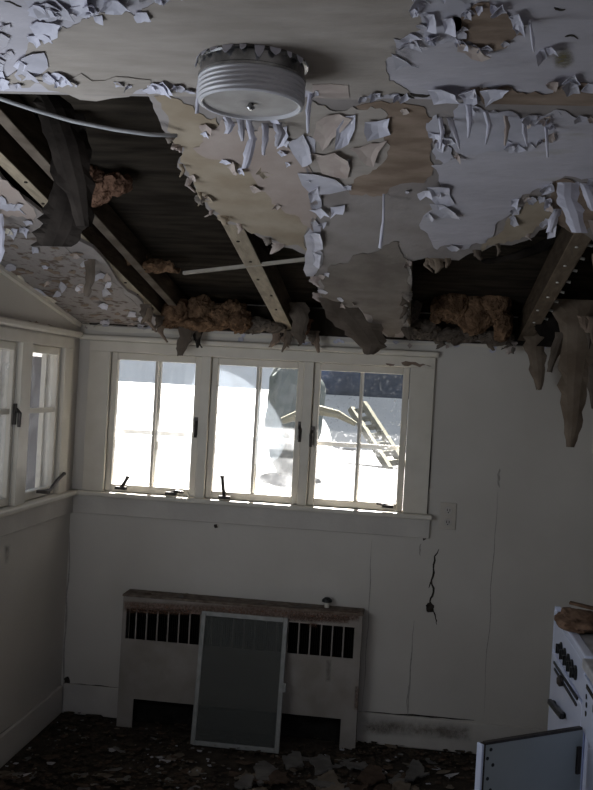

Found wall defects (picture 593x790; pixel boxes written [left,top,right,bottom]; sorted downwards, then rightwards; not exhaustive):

peeling [0,0,593,354]
crack [362,544,469,720]